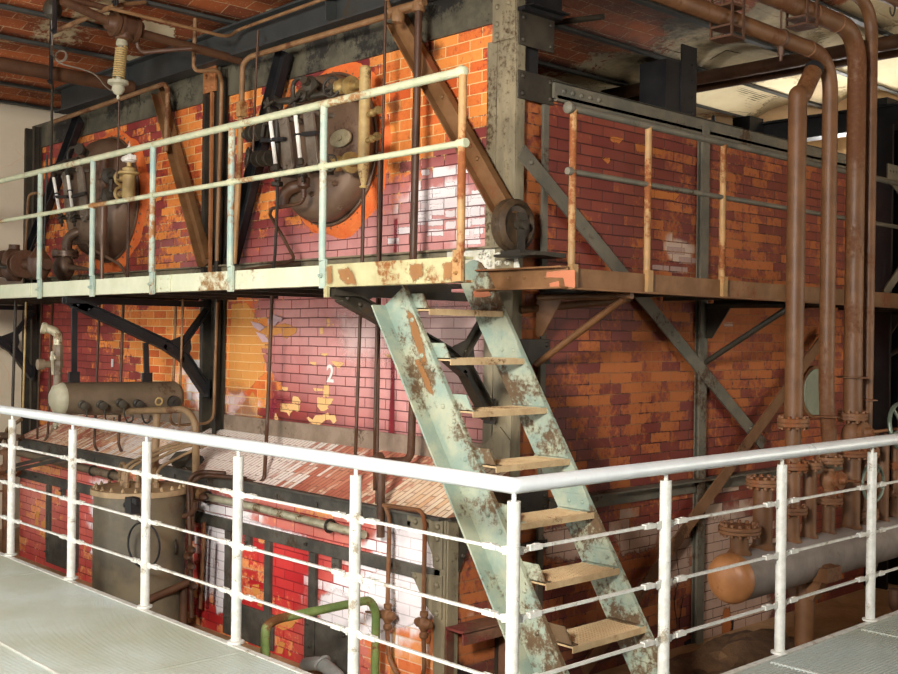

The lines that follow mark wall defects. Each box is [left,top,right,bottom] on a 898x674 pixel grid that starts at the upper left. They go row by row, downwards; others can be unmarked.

peeling [142,20,175,38]
corrosion [326,266,356,285]
corrosion [409,263,423,282]
corrosion [442,261,452,279]
peeling [228,303,297,418]
corrosion [407,311,433,394]
peeling [274,387,301,420]
peeling [308,386,337,425]
peeling [276,620,296,630]